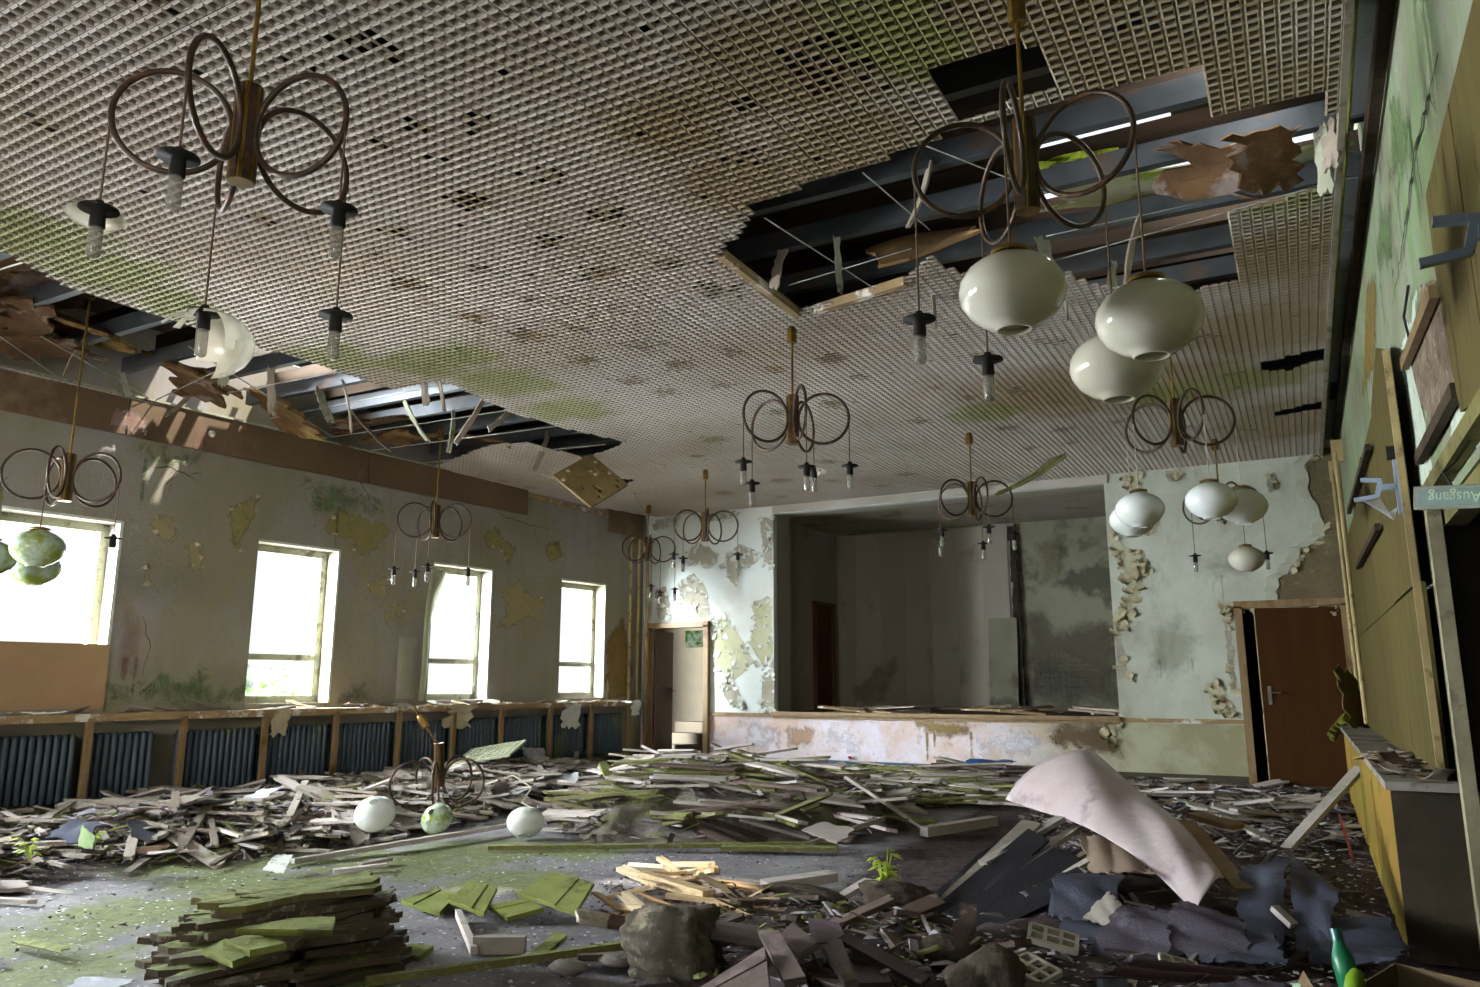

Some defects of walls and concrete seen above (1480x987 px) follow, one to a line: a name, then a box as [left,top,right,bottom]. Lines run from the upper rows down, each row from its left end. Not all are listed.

peeling [324,510,390,556]
peeling [418,569,446,701]
peeling [649,509,776,715]
damp [1027,614,1118,702]
peeling [1119,471,1143,491]
peeling [1107,521,1159,683]
spalling [1203,439,1350,718]